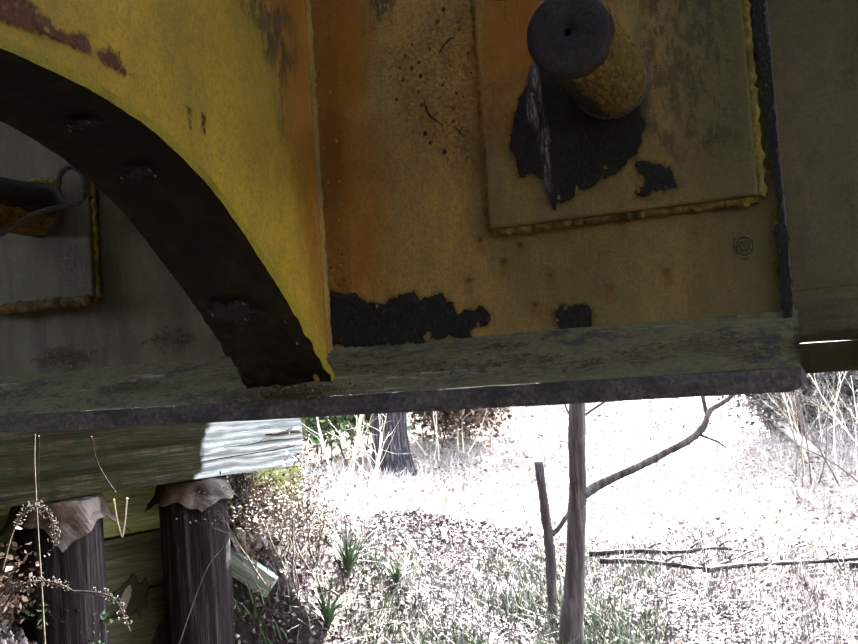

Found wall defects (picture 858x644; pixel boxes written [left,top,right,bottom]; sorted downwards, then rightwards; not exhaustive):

rust [0,0,127,76]
peeling [509,8,678,210]
peeling [330,289,491,348]
peeling [555,303,592,329]